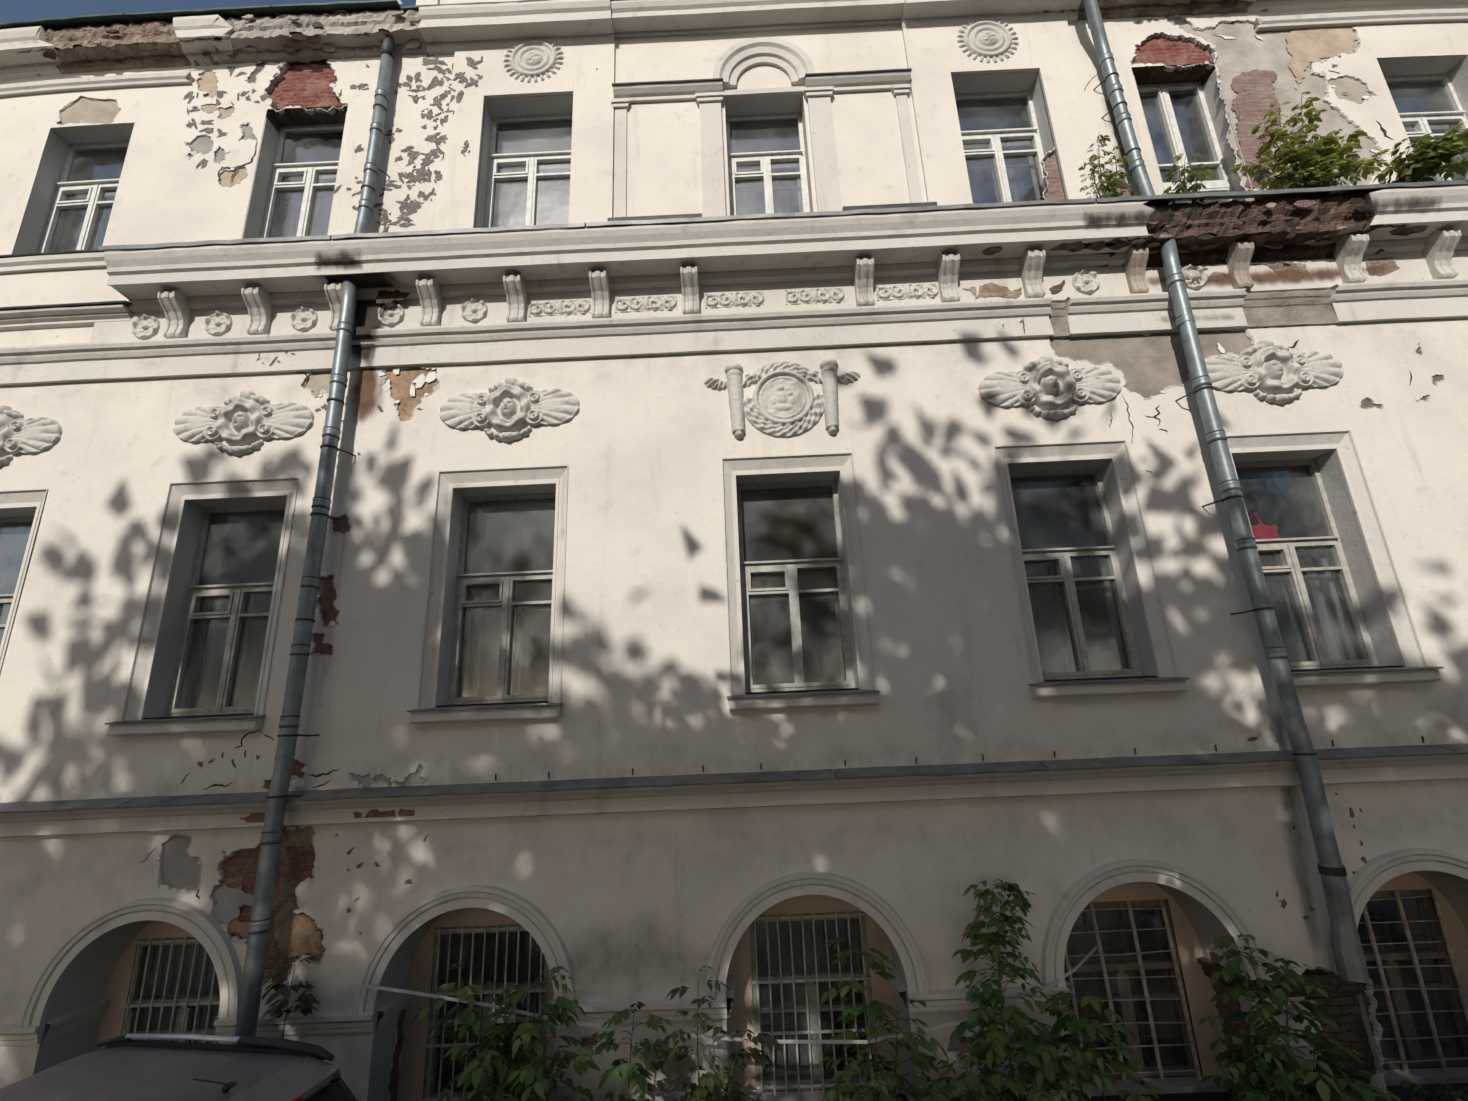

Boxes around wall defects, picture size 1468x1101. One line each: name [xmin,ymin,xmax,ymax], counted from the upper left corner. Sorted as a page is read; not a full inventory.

spalling [18,9,483,233]
spalling [1041,0,1428,401]
spalling [363,366,440,421]
spalling [310,574,341,658]
peeling [197,749,260,769]
spalling [240,813,265,823]
spalling [157,833,261,966]
spalling [263,825,326,986]